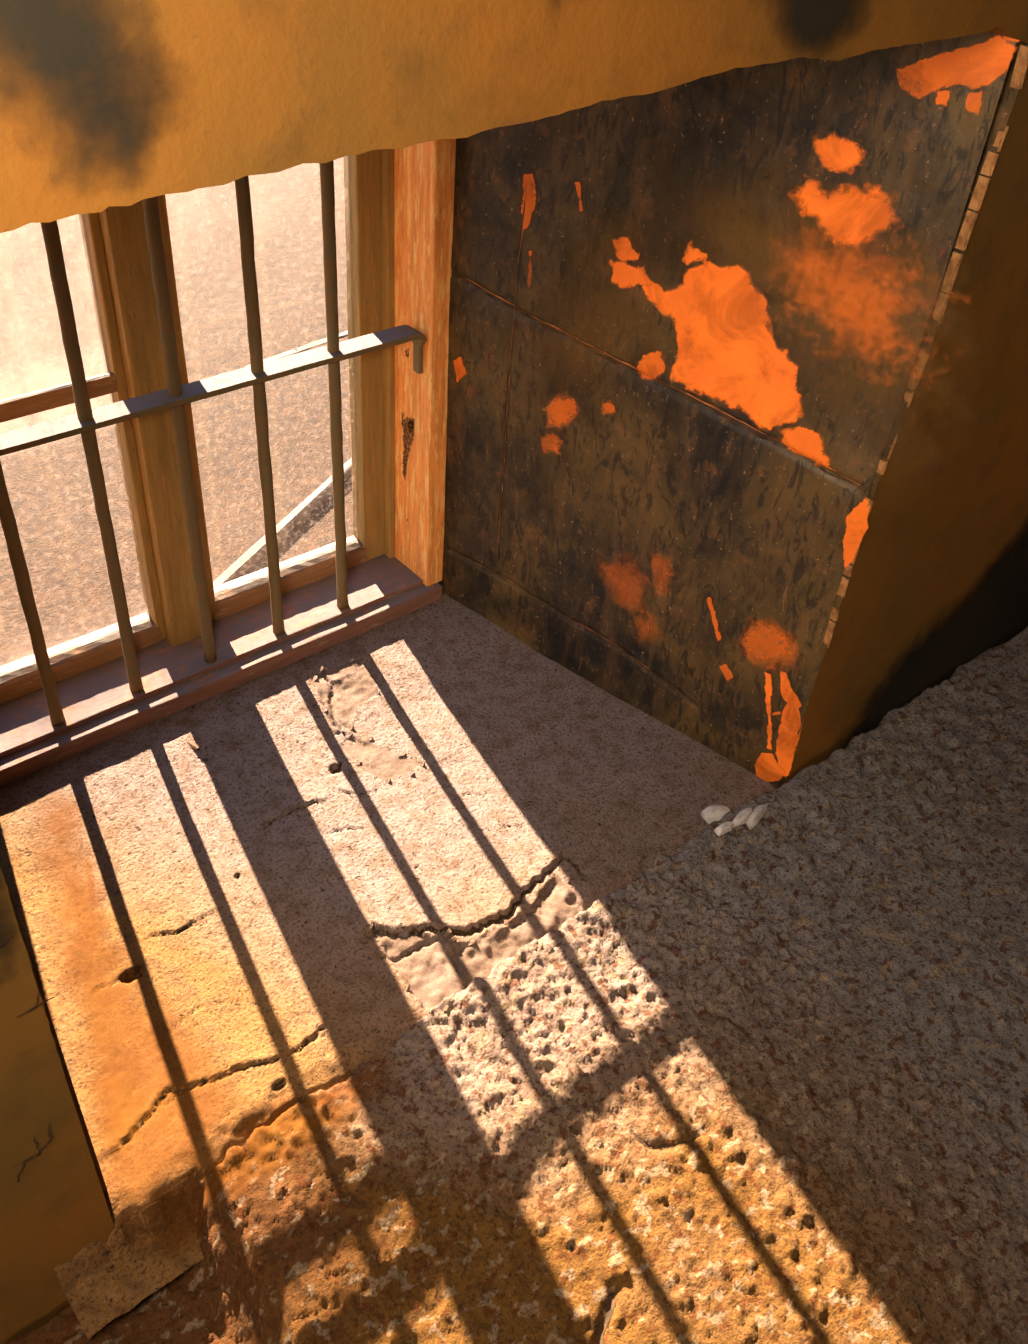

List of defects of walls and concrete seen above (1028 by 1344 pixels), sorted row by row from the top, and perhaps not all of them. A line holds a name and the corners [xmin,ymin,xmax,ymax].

crack [373,857,586,963]
crack [122,1028,324,1144]